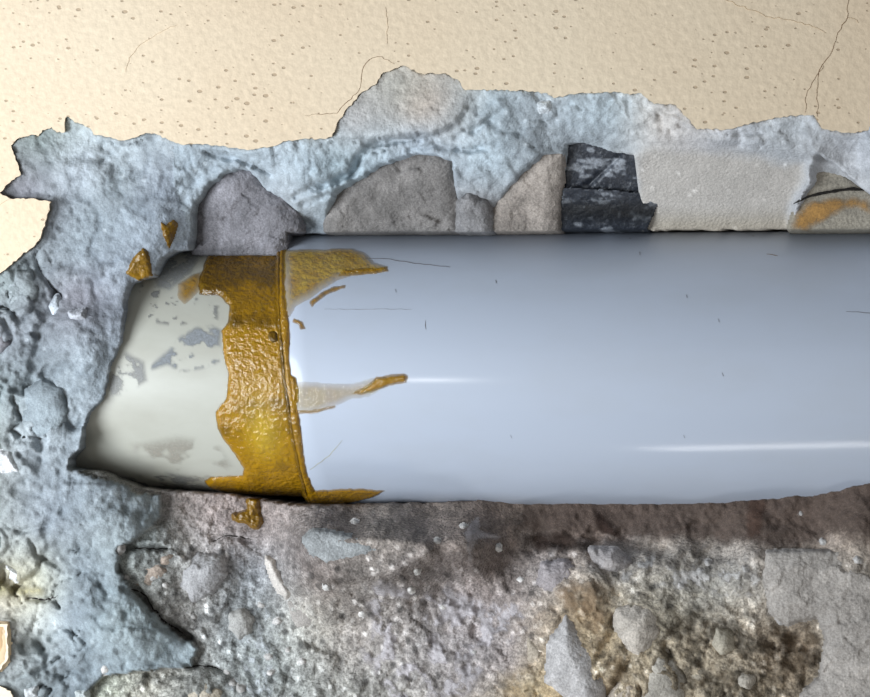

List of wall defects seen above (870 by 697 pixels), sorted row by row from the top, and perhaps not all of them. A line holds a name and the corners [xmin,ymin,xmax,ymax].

crack [727,0,858,117]
spalling [172,66,870,256]
rust [795,200,866,229]
spalling [0,117,198,697]
spalling [81,469,870,697]